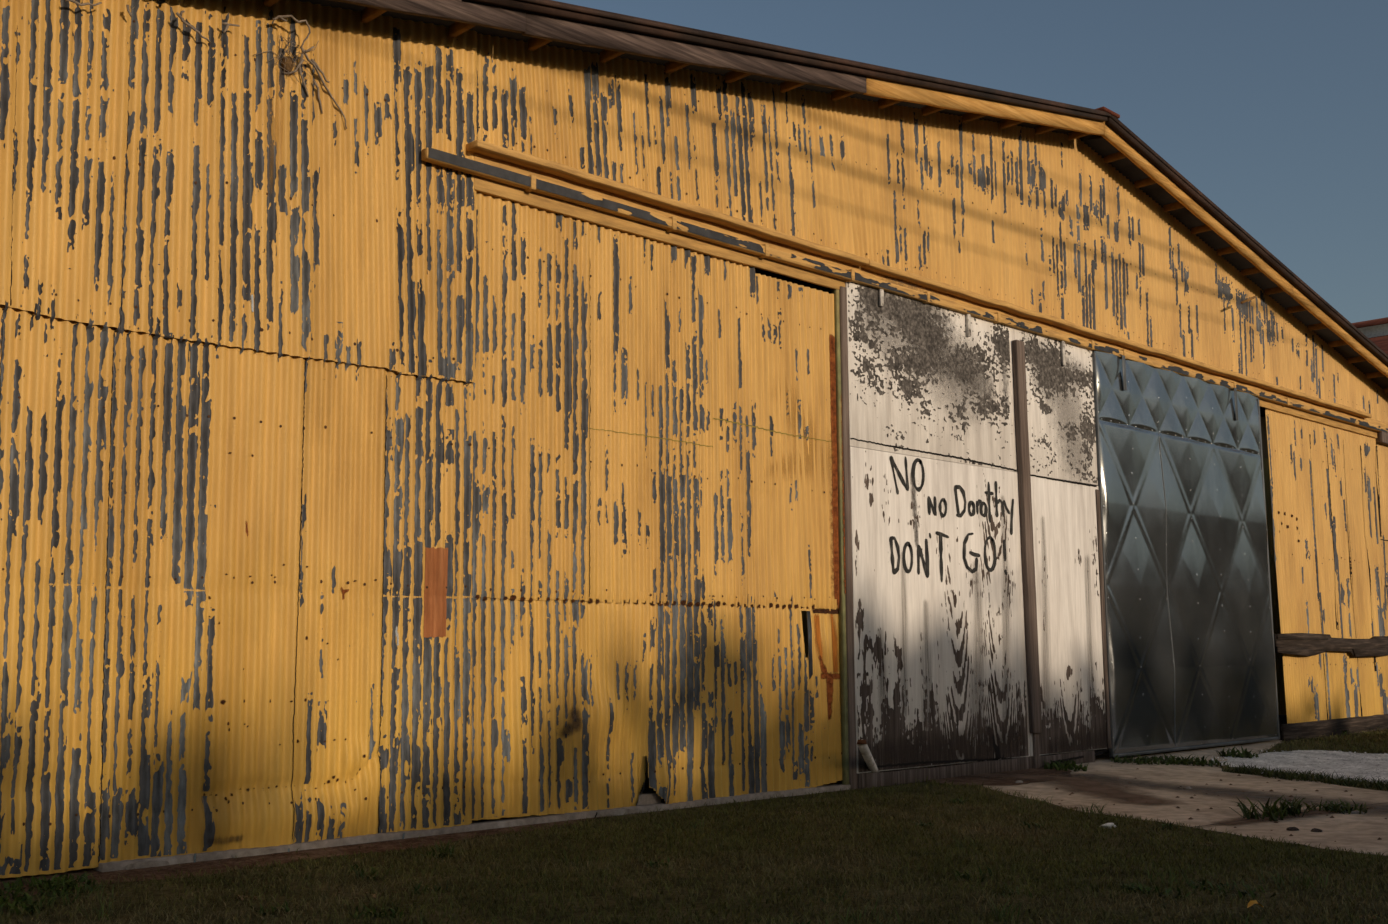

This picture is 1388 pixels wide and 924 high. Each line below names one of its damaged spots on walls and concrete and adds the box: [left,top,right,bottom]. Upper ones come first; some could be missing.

peeling [0,0,362,875]
peeling [332,22,1388,833]
damp [848,282,1098,483]